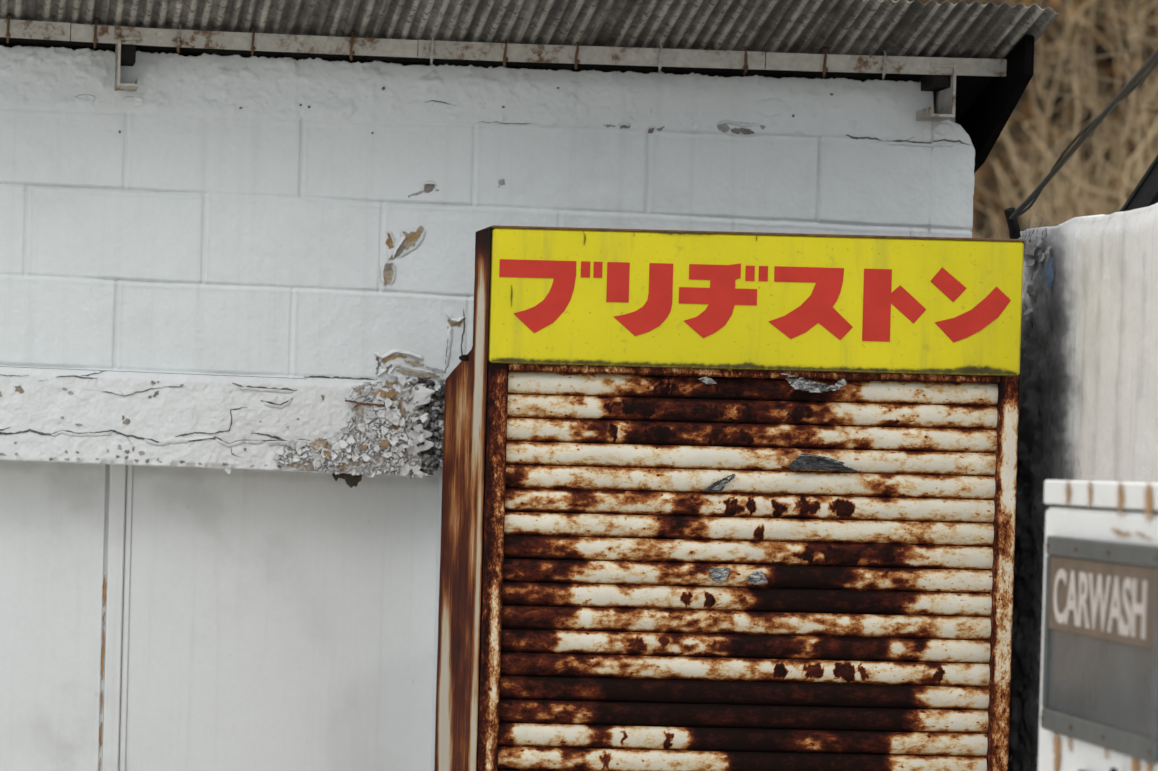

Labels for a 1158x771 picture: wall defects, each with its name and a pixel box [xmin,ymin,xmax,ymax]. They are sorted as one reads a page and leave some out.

peeling [379,225,426,285]
crack [0,370,180,397]
crack [0,376,377,458]
spalling [250,348,445,488]
water stain [1008,229,1067,771]
rust [1145,483,1153,520]